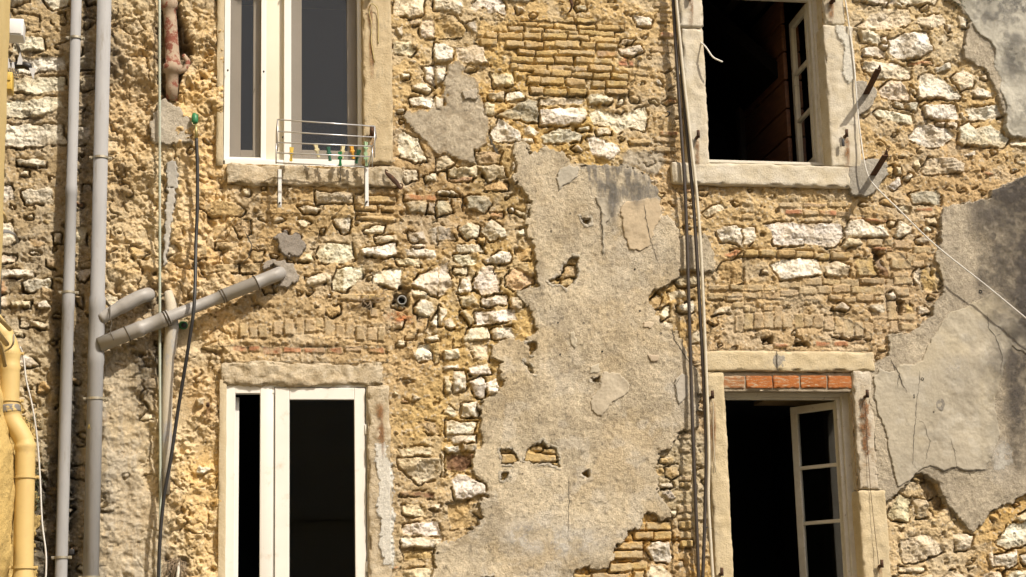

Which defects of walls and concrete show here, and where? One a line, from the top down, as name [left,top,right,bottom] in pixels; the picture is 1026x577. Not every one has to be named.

peeling [944,0,1026,140]
damp [587,165,660,211]
peeling [431,141,716,577]
rust [860,403,871,455]
peeling [707,174,1026,534]
crack [891,360,987,476]